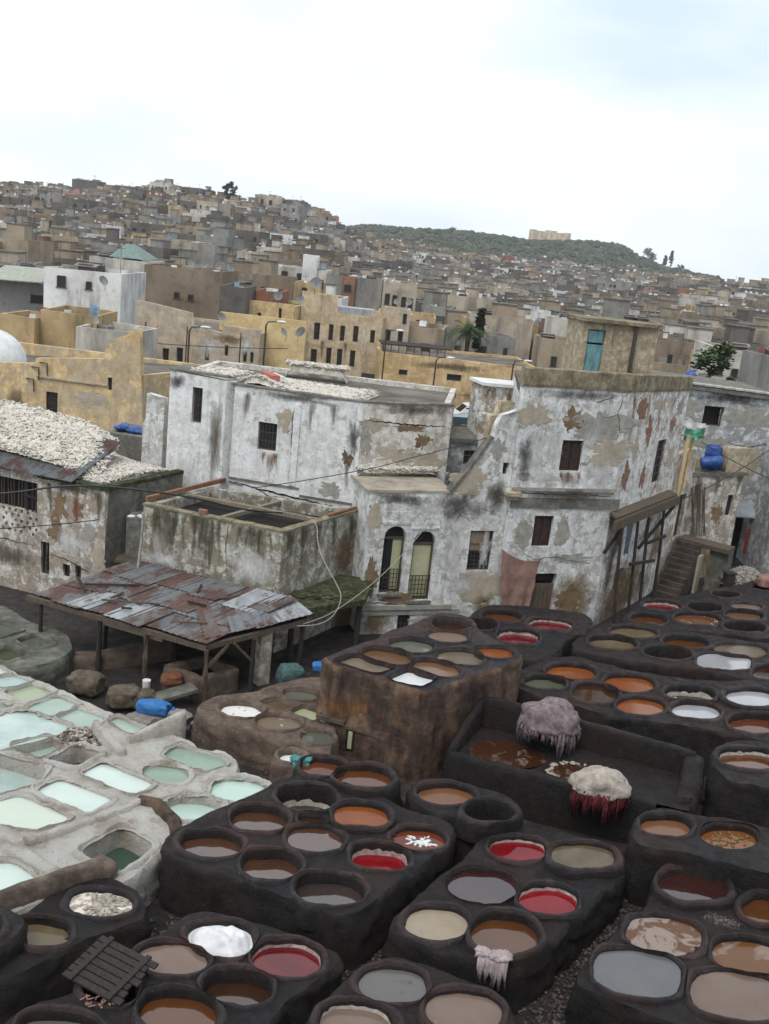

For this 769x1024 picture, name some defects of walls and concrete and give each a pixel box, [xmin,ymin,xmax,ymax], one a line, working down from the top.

leakage [210,415,219,471]
peeling [275,408,294,434]
crack [367,419,445,427]
peeling [342,417,508,498]
peeling [516,394,733,497]
peeling [318,481,342,500]
peeling [45,491,106,573]
leakage [153,511,220,555]
leakage [289,518,353,569]